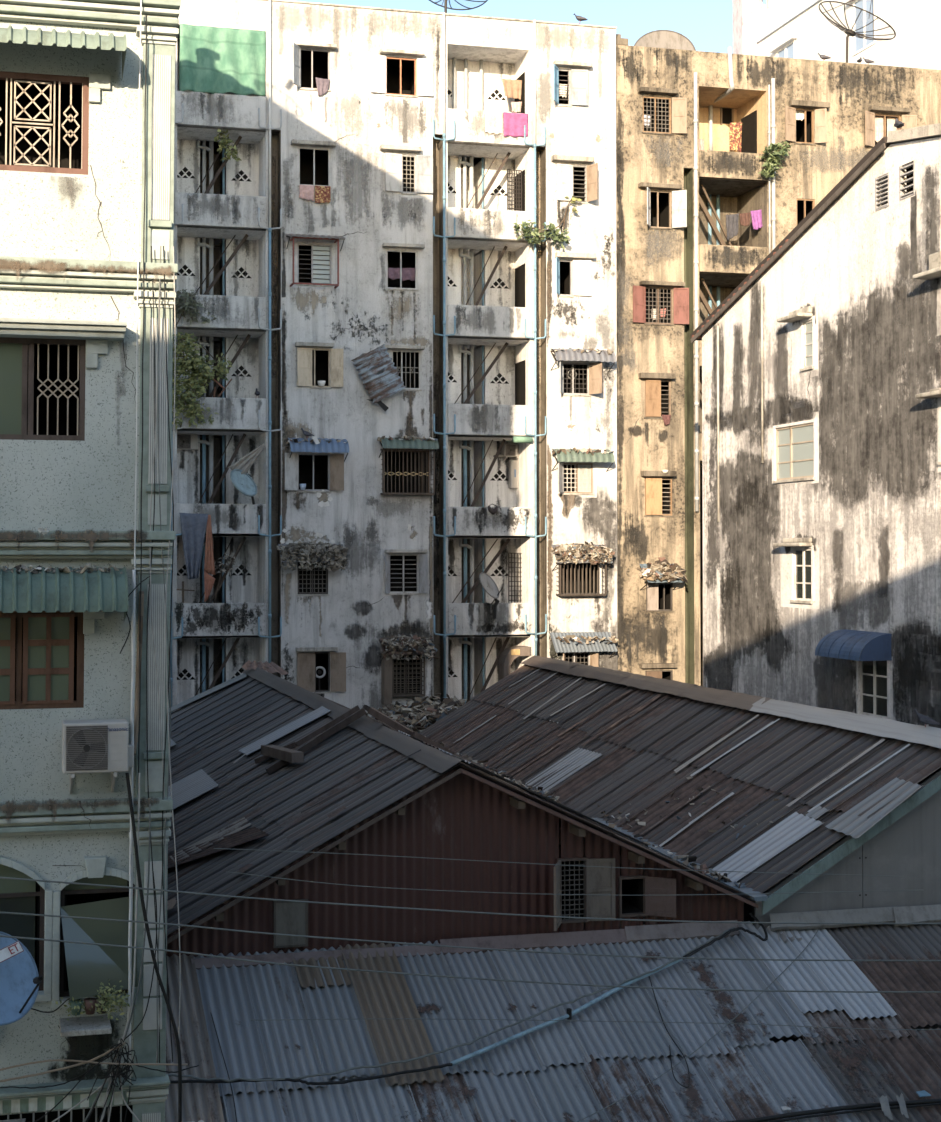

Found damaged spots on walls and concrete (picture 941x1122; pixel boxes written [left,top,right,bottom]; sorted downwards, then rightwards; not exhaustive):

leakage [616,45,688,86]
leakage [702,152,764,175]
crack [90,165,111,253]
leakage [547,103,676,672]
leakage [179,450,199,512]
leakage [234,435,255,479]
leakage [703,167,941,691]
leakage [177,486,263,695]
leakage [814,651,856,713]
corrosion [683,960,770,1041]